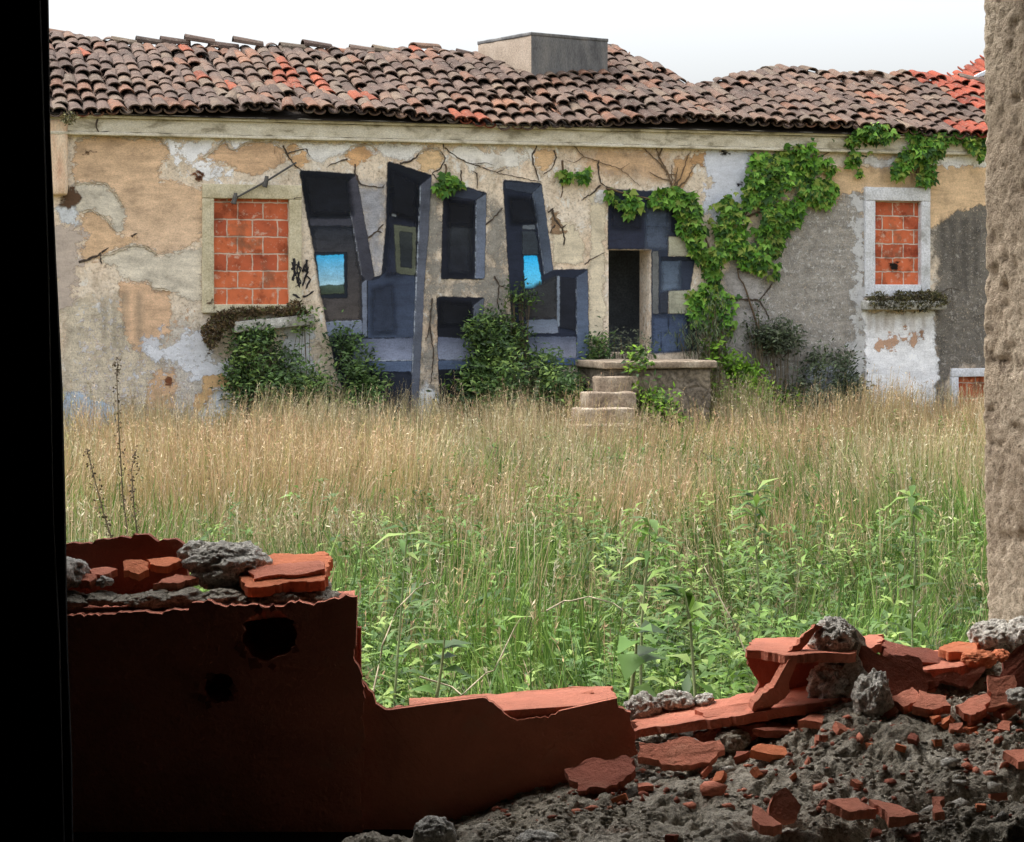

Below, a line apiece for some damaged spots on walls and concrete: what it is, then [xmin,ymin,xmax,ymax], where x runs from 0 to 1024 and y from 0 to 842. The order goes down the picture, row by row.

crack [282,145,385,188]
crack [400,144,557,188]
crack [581,160,611,201]
crack [548,208,567,246]
flaking render [54,135,557,436]
peeling [724,155,987,415]
damp [930,204,989,415]